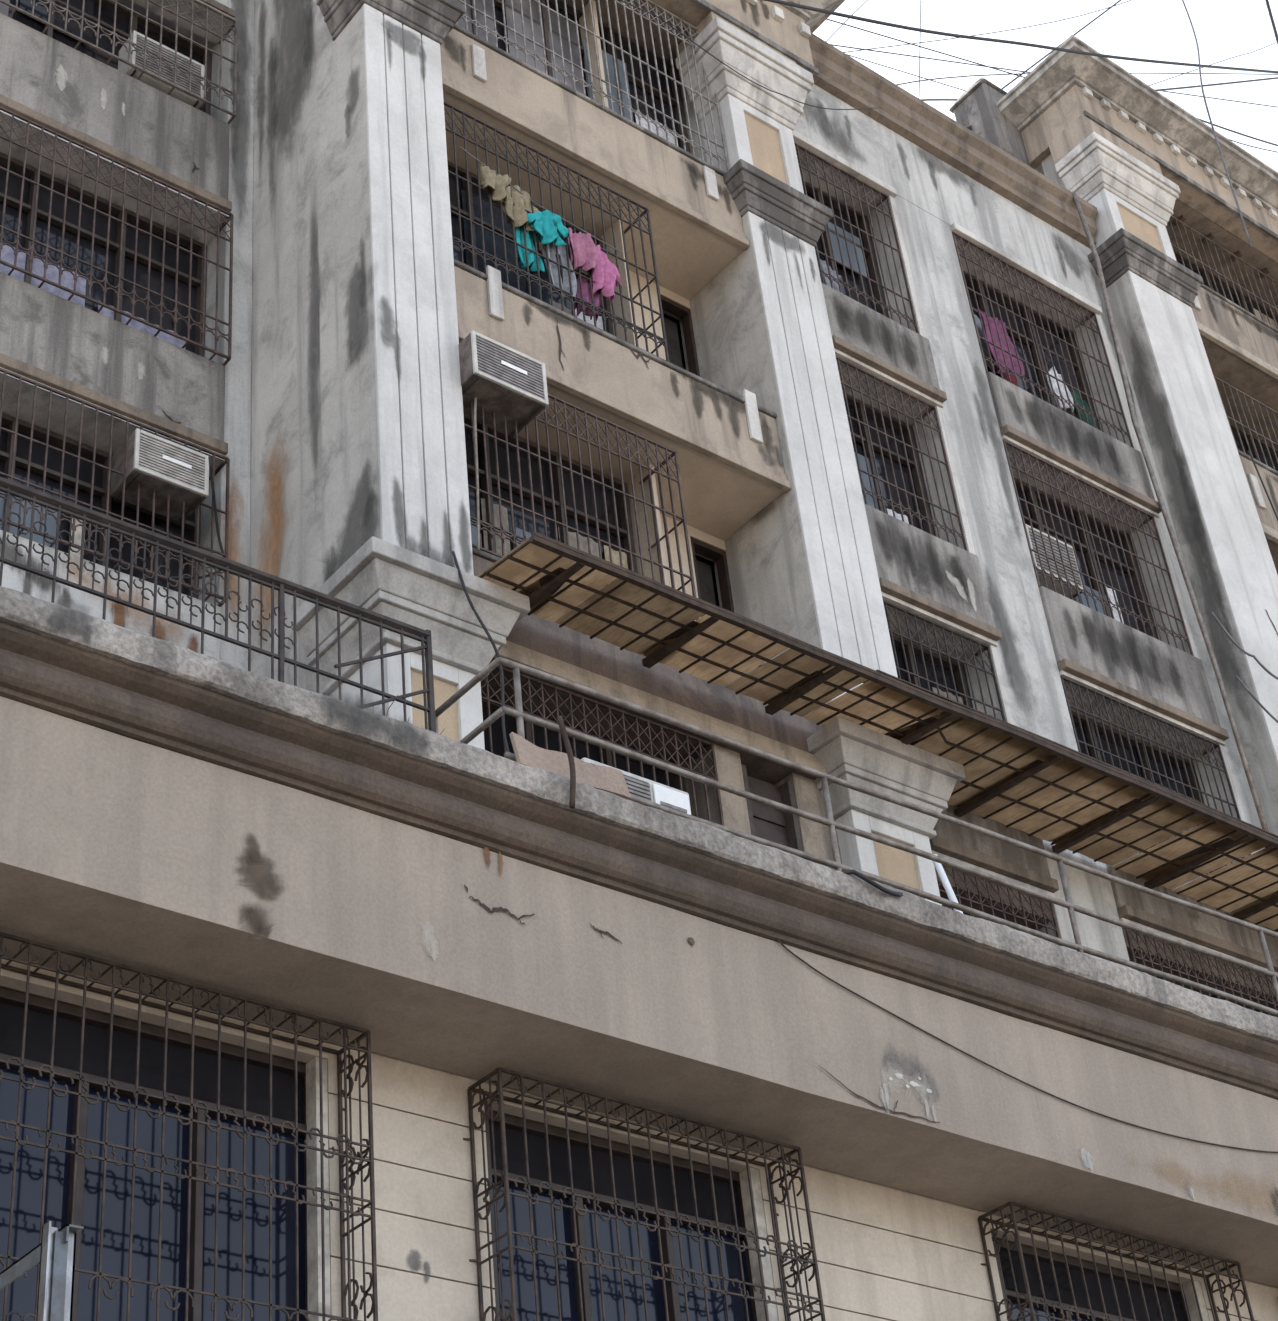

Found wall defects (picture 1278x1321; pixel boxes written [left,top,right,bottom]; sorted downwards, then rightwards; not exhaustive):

water stain [233,0,312,215]
water stain [345,72,357,136]
corrosion [259,459,281,615]
corrosion [112,597,125,628]
water stain [239,835,280,939]
crack [464,885,535,924]
crack [590,923,622,944]
peeling [881,1055,936,1120]